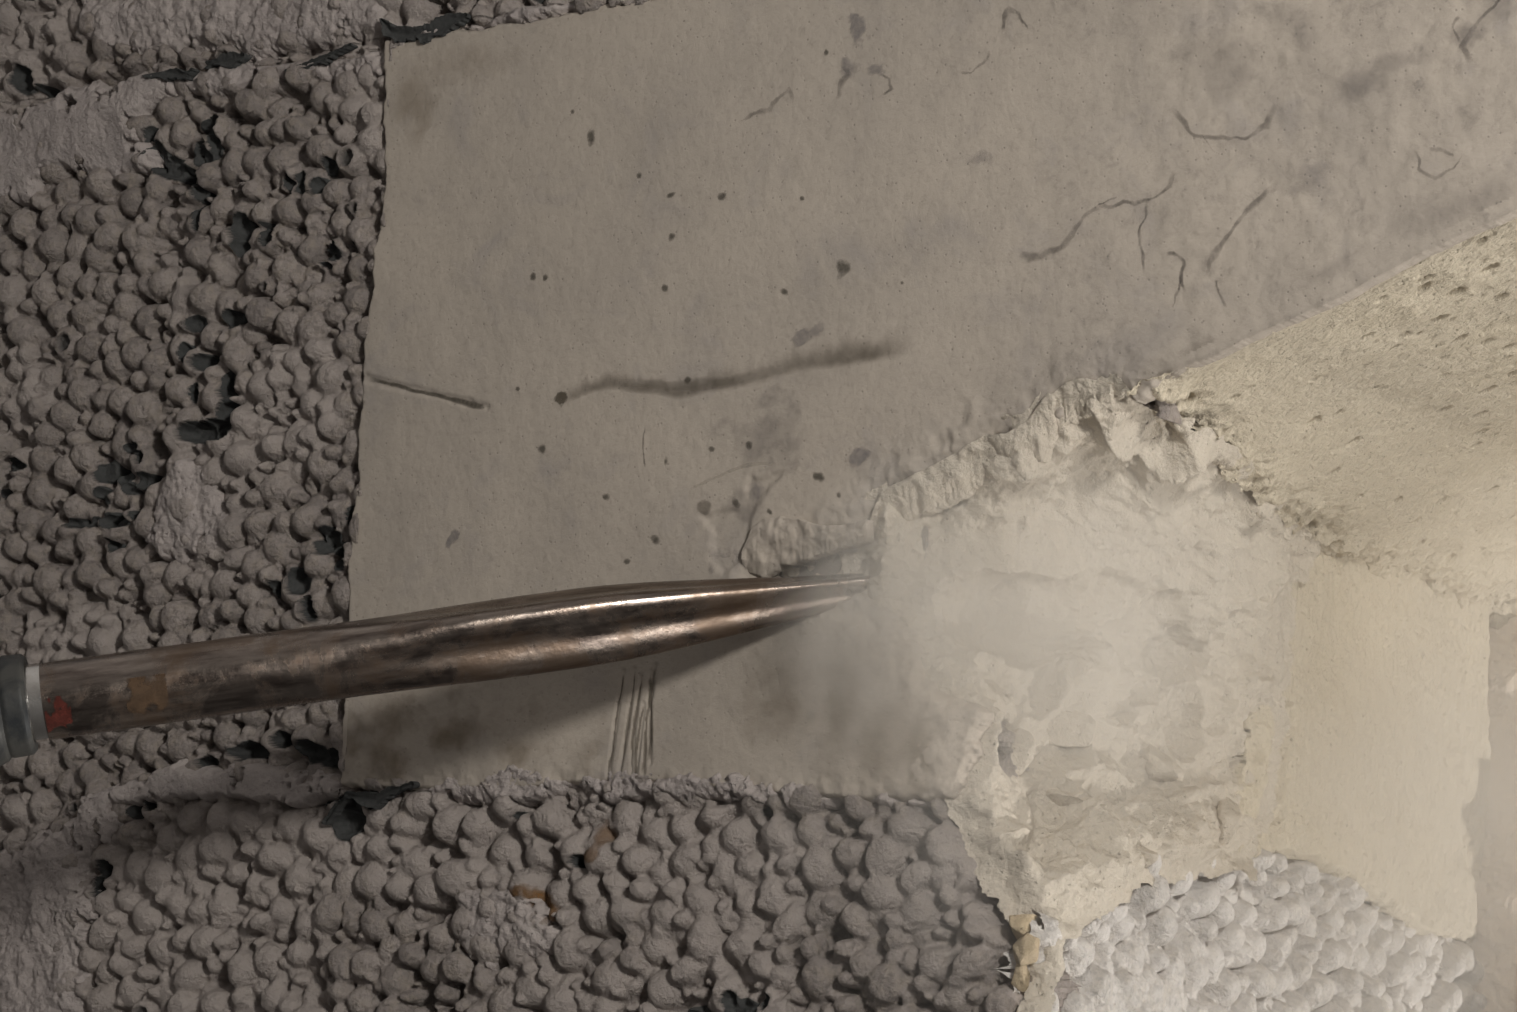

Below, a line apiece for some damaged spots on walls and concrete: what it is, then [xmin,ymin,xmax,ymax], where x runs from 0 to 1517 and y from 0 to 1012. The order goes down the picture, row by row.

crack [1100,190,1184,286]
crack [378,380,482,408]
spalling [741,373,1322,1012]
spalling [570,854,586,868]